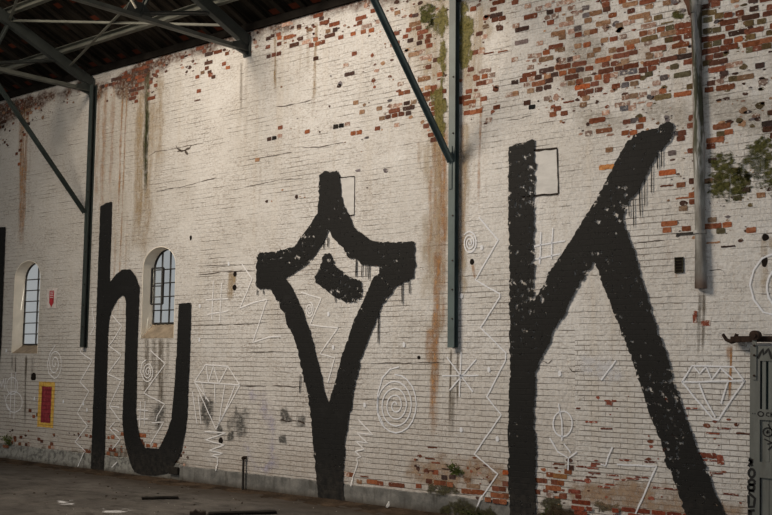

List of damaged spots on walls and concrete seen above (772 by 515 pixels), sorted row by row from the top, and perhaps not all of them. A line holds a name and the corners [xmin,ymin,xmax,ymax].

peeling [99,42,235,104]
peeling [248,0,449,143]
peeling [702,0,772,163]
peeling [459,0,695,239]
peeling [704,167,771,207]
peeling [705,203,769,248]
corrosion [424,250,440,405]
peeling [693,311,711,326]
peeling [344,472,405,488]
peeling [414,446,509,505]
peeling [535,458,686,515]
peeling [698,418,750,476]